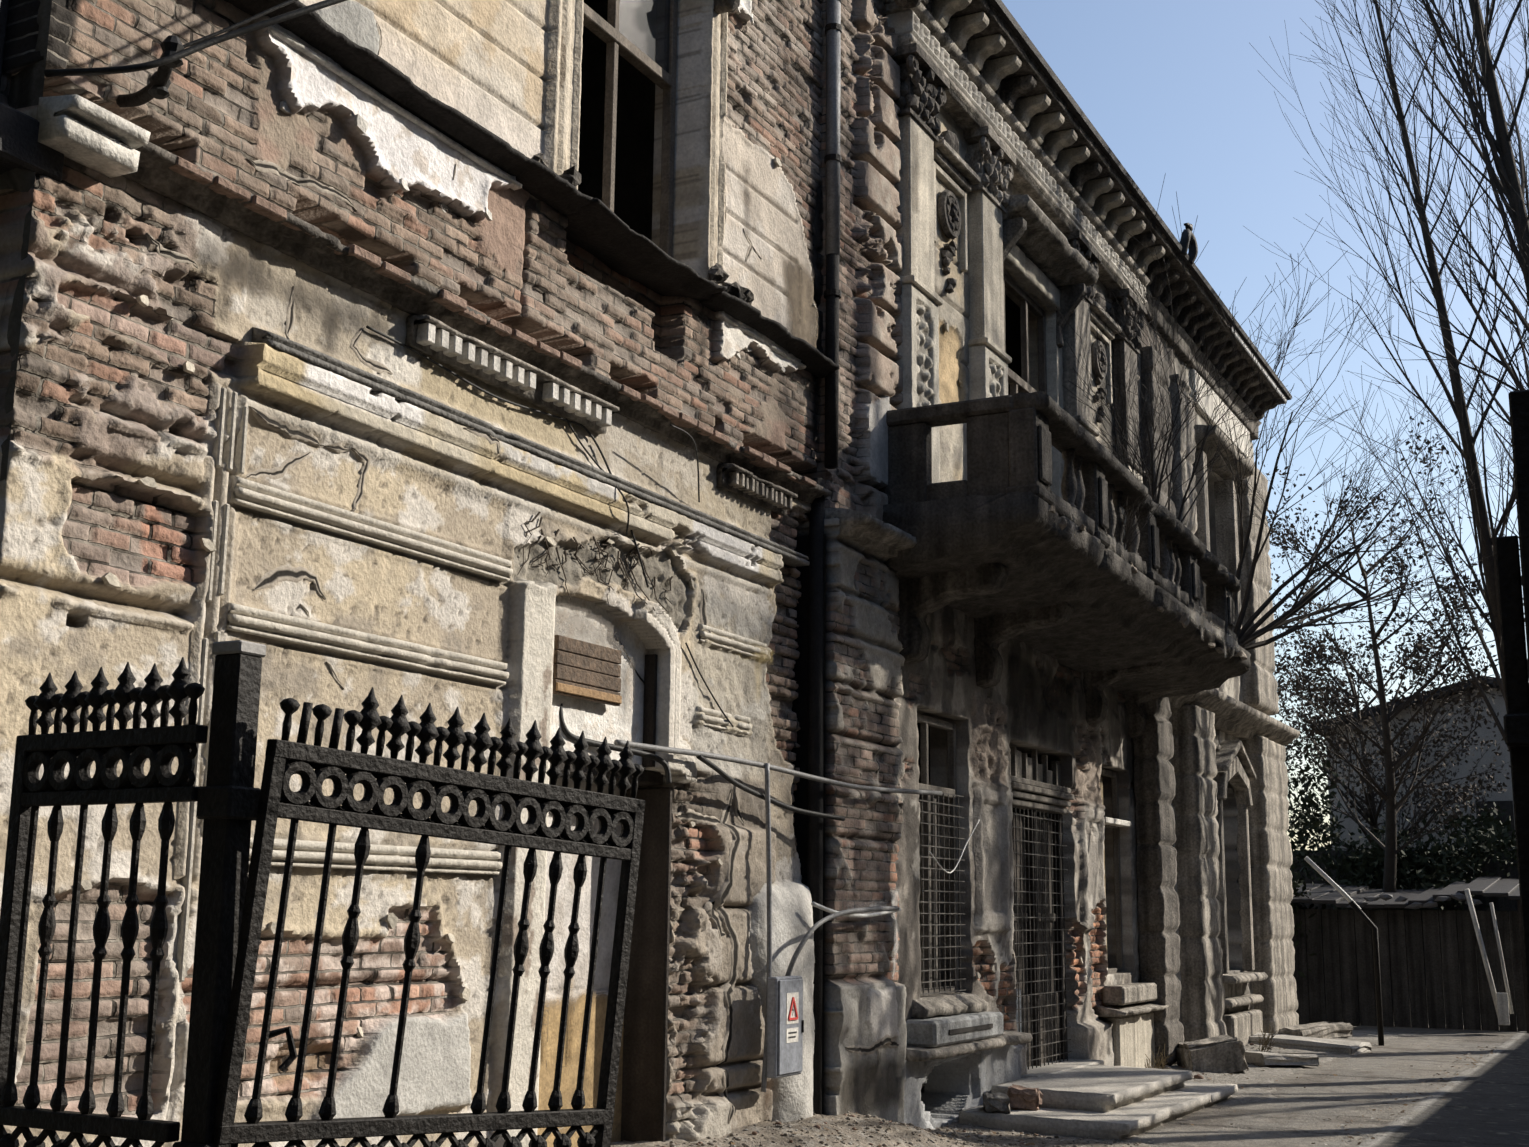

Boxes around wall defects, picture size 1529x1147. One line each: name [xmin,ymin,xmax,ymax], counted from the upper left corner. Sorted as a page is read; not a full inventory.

peeling [261,16,516,221]
spalling [57,280,265,378]
crack [246,406,371,512]
spalling [62,476,216,588]
crack [253,565,326,620]
spalling [512,536,696,632]
spalling [684,821,725,884]
spalling [14,877,194,1116]
spalling [238,906,471,1097]
spalling [887,839,900,982]
spalling [972,940,1026,1045]
spalling [1065,901,1108,1021]